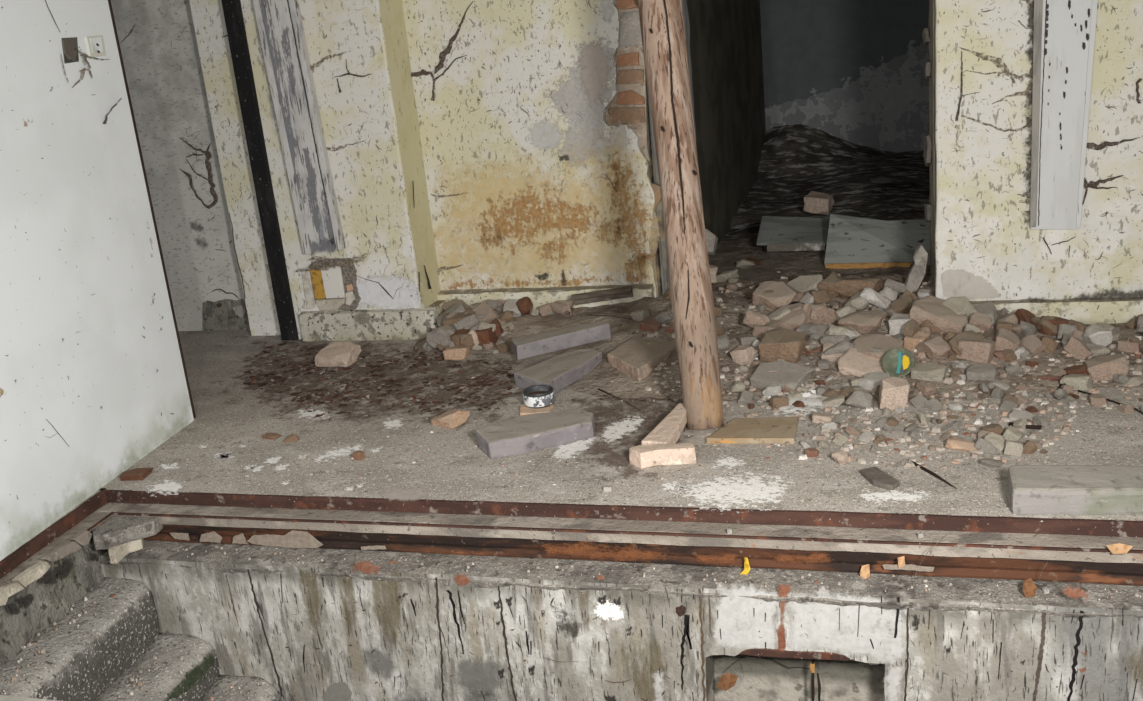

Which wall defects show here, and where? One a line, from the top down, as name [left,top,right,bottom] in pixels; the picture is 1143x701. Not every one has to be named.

peeling [529,0,646,172]
flaking render [256,0,421,311]
water stain [438,152,651,289]
flaking render [651,183,661,208]
crack [226,569,283,697]
crack [498,586,517,701]
spalling [0,530,1143,701]
rust [542,541,662,561]
rust [695,554,735,563]
rust [777,584,790,651]